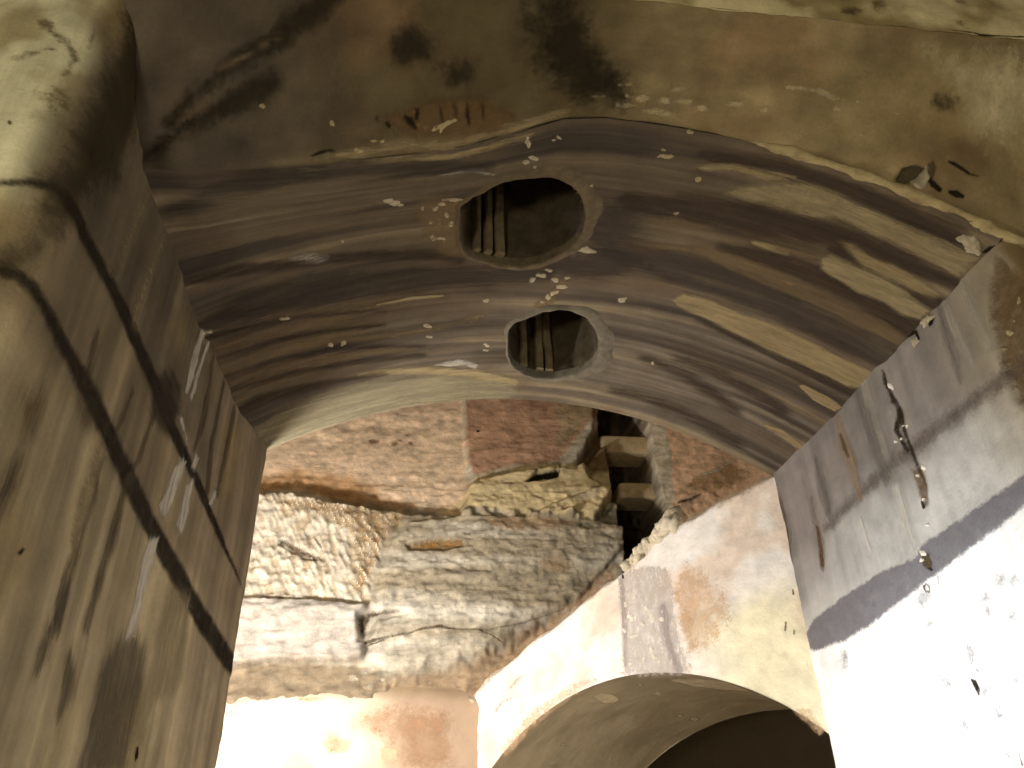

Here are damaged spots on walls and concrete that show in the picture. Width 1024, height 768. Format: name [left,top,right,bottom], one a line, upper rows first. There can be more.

water stain [164,0,339,127]
water stain [523,0,707,116]
flaking render [291,109,566,170]
spalling [896,161,935,190]
peeling [420,193,463,256]
peeling [956,234,981,256]
water stain [0,26,981,576]
peeling [529,268,571,309]
crack [883,373,927,509]
spalling [620,462,744,572]
crack [357,610,537,646]